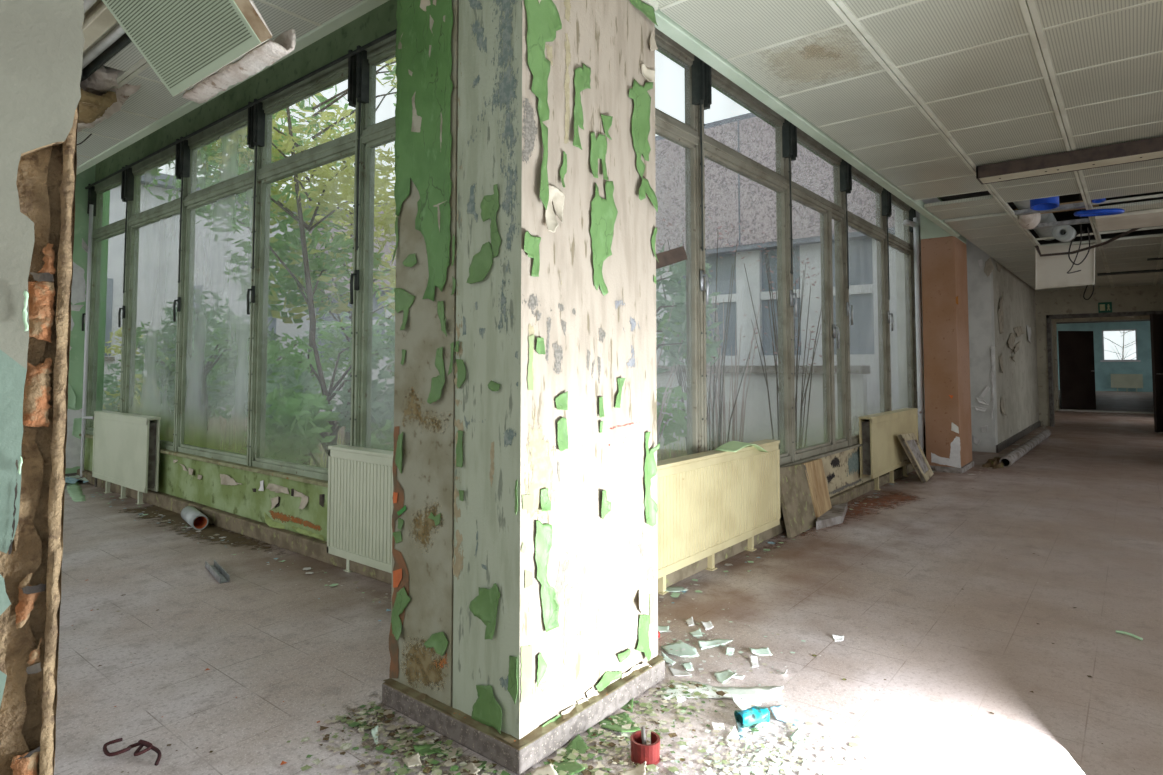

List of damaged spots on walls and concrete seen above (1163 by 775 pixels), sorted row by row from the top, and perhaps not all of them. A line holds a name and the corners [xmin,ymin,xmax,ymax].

peeling [629,0,658,212]
spalling [0,103,91,775]
peeling [220,474,325,510]
spalling [389,426,411,679]
peeling [392,0,618,640]
peeling [599,378,626,433]
peeling [644,432,660,527]
peeling [931,293,1031,468]
peeling [471,645,547,733]
peeling [542,590,656,727]